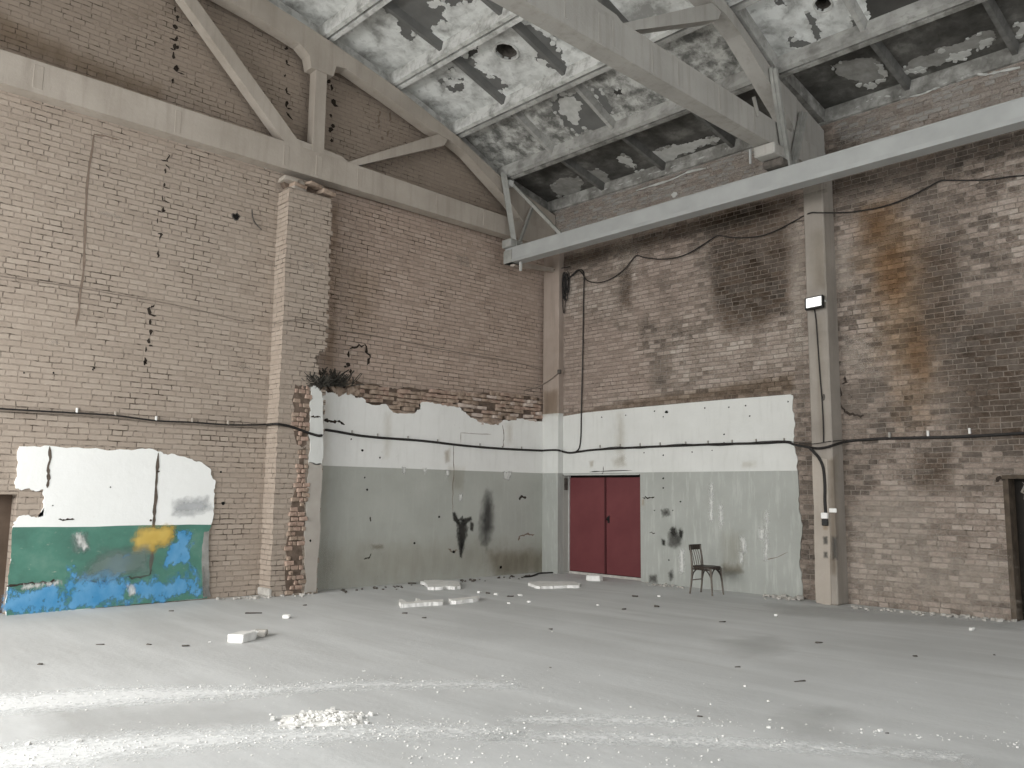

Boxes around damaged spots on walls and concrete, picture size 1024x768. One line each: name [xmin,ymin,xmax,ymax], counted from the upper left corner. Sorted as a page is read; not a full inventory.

crack [169,7,193,83]
peeling [385,0,473,43]
peeling [437,46,510,94]
crack [327,79,338,142]
peeling [548,88,622,136]
peeling [550,135,726,198]
crack [157,155,170,258]
crack [143,305,156,365]
crack [344,344,371,374]
spalling [326,379,543,425]
crack [92,453,160,583]
spalling [284,384,312,595]